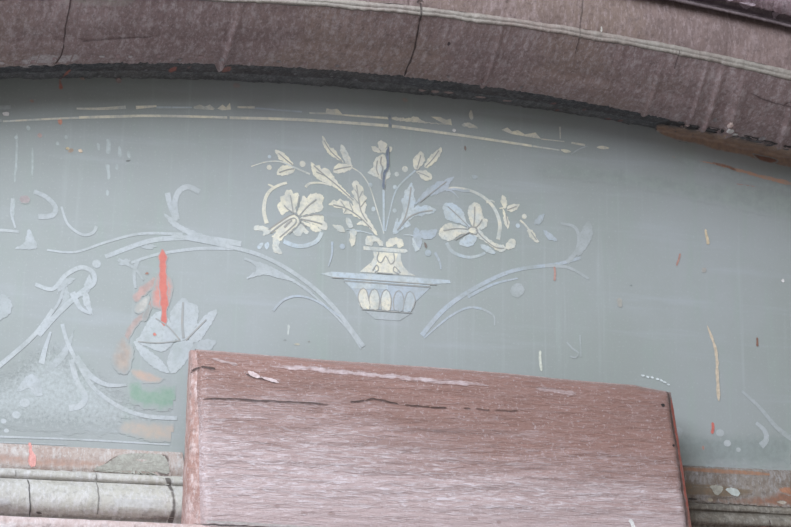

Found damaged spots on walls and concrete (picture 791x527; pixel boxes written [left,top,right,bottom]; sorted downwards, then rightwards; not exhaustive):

crack [54,0,149,65]
crack [403,0,423,77]
crack [574,0,583,57]
crack [751,93,791,107]
spalling [663,118,791,149]
crack [203,397,328,405]
crack [350,398,518,412]
peeling [641,374,692,527]
crack [15,470,31,517]